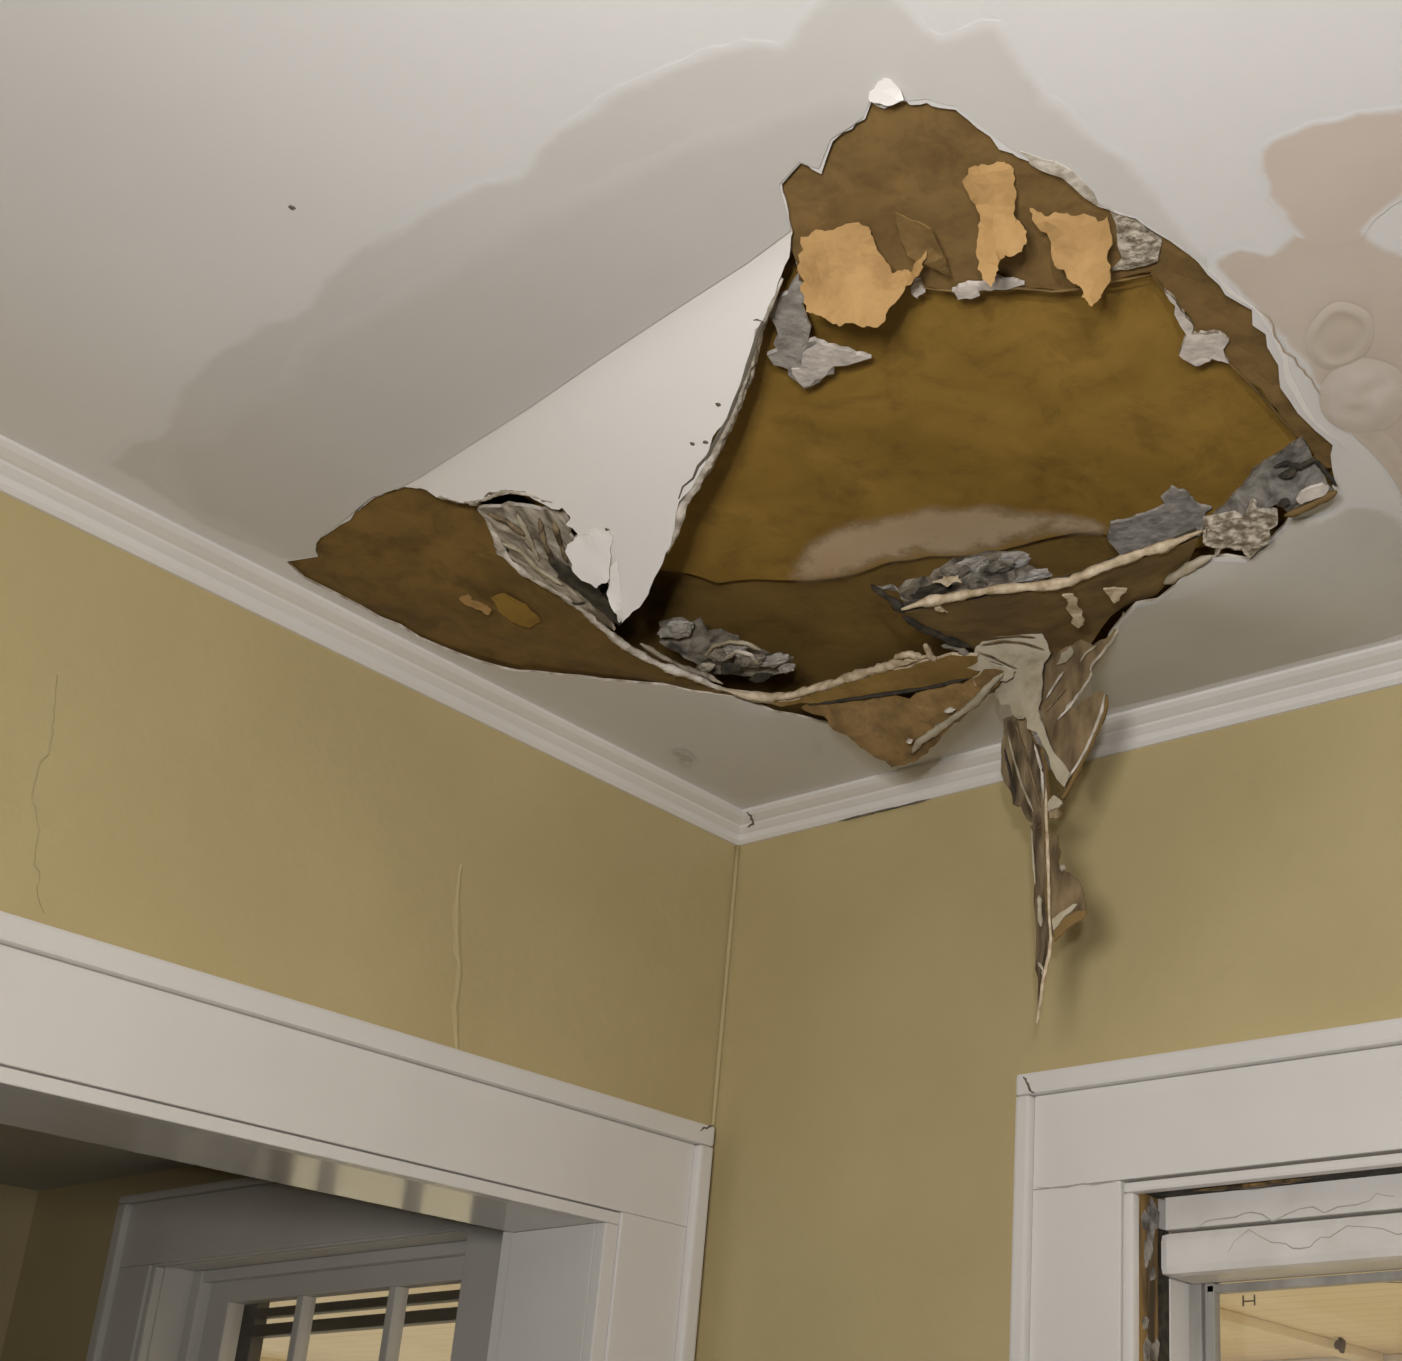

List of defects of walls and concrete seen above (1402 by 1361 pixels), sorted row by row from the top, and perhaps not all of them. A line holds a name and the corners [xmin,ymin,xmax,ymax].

peeling [868,78,904,106]
leakage [103,0,1402,560]
peeling [911,277,926,299]
peeling [952,274,1025,300]
peeling [1164,288,1229,366]
peeling [1277,468,1329,507]
peeling [289,487,927,707]
spalling [901,529,1203,628]
leakage [1091,504,1402,709]
peeling [906,673,1003,754]